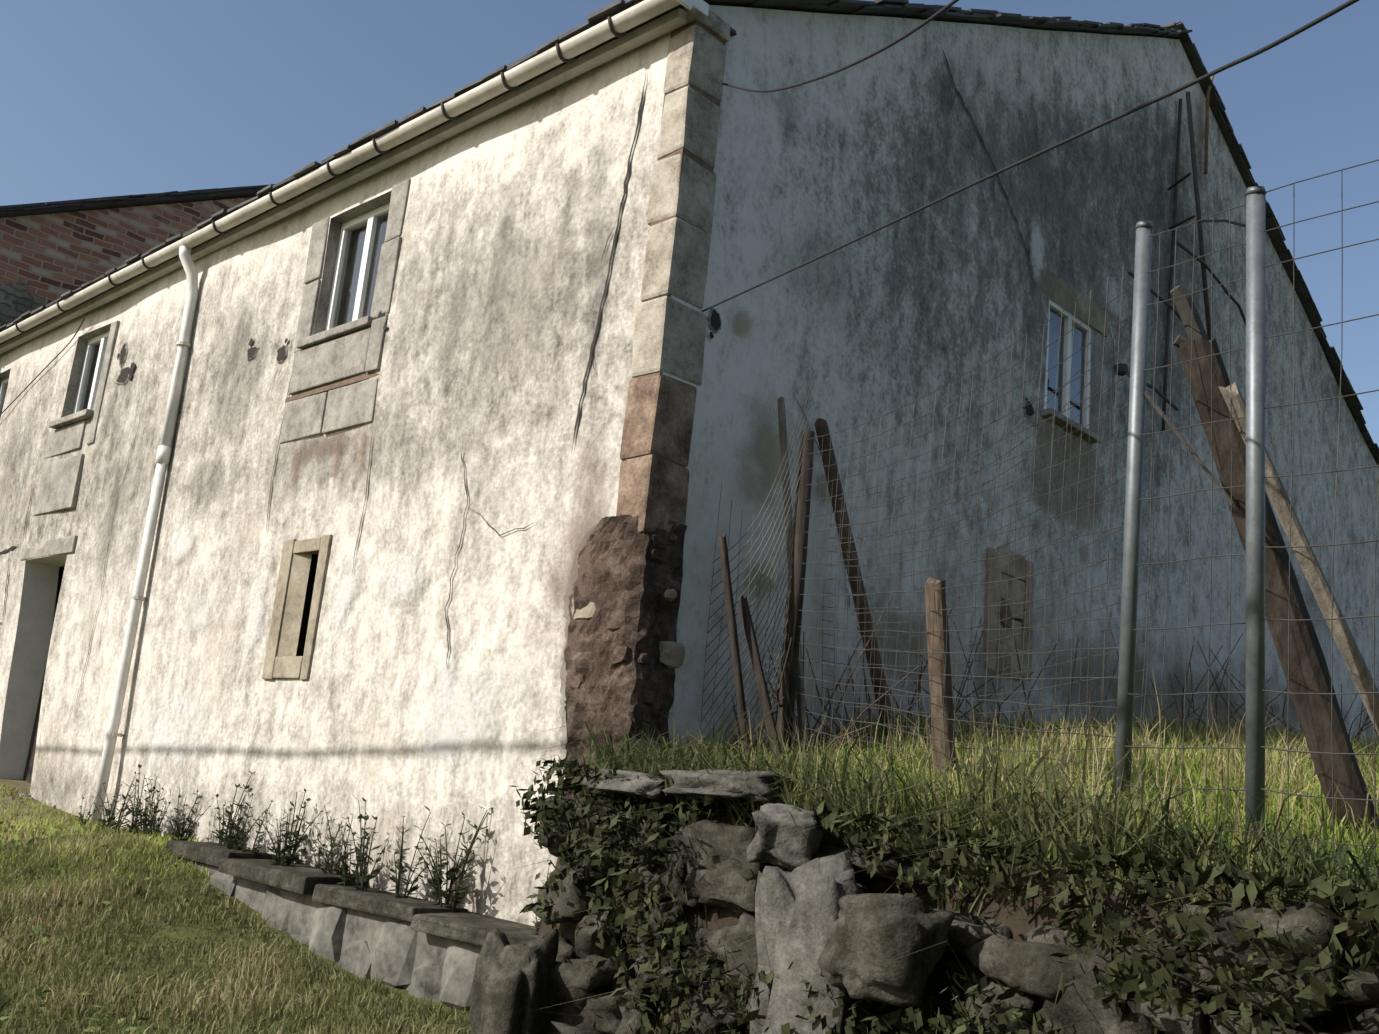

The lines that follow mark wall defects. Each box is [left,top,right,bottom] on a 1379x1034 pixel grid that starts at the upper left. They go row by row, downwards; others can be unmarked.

crack [571,73,646,453]
crack [445,439,538,670]